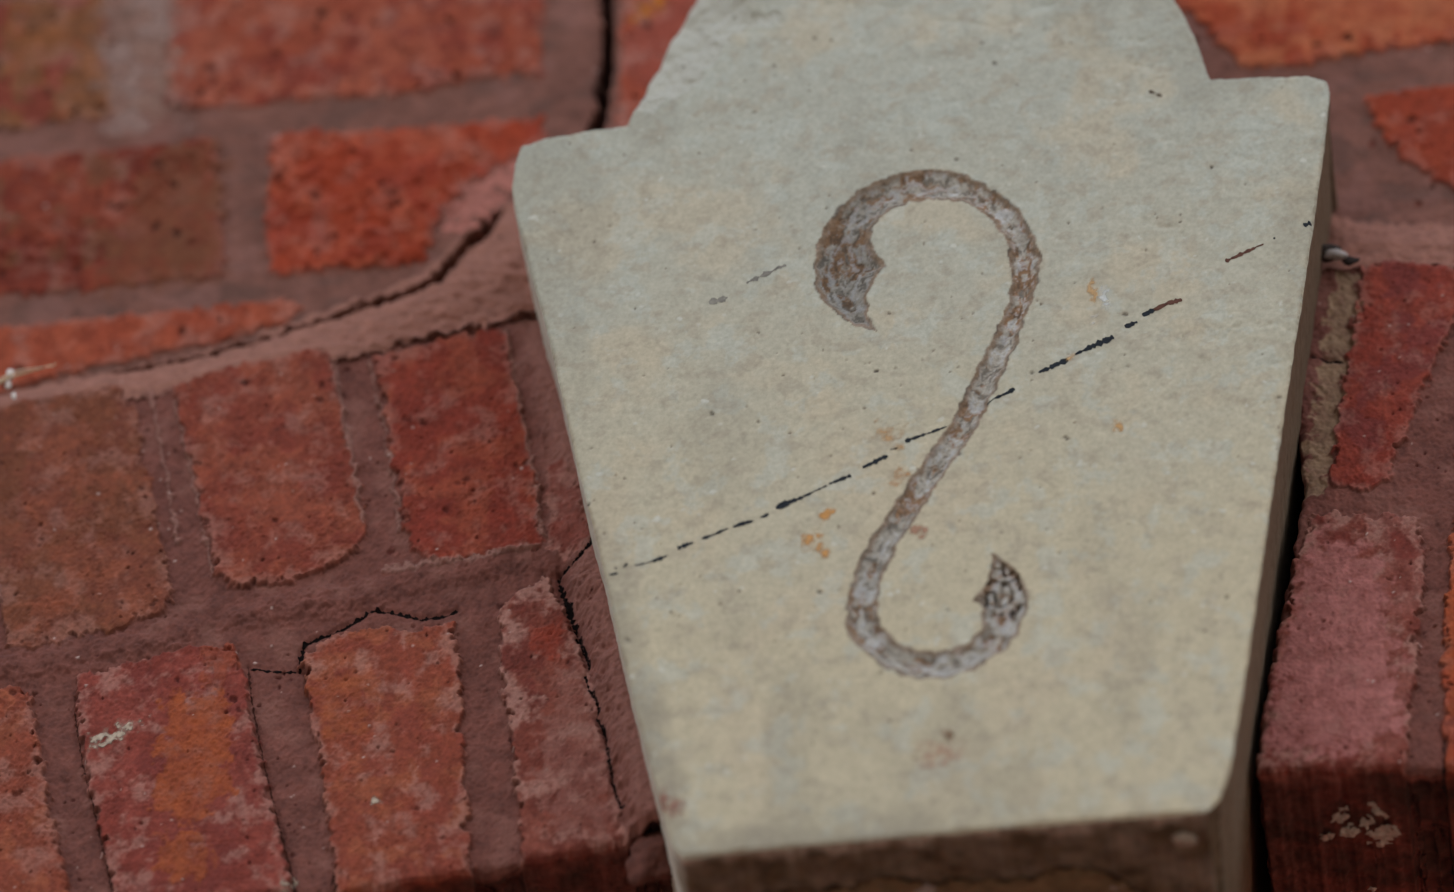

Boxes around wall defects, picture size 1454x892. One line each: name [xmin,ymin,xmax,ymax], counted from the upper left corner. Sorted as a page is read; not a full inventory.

crack [586,0,615,131]
crack [112,208,504,374]
crack [986,298,1182,406]
crack [1225,221,1312,263]
crack [1310,356,1343,364]
crack [557,426,947,809]
crack [247,607,458,892]
peeling [1319,802,1402,848]